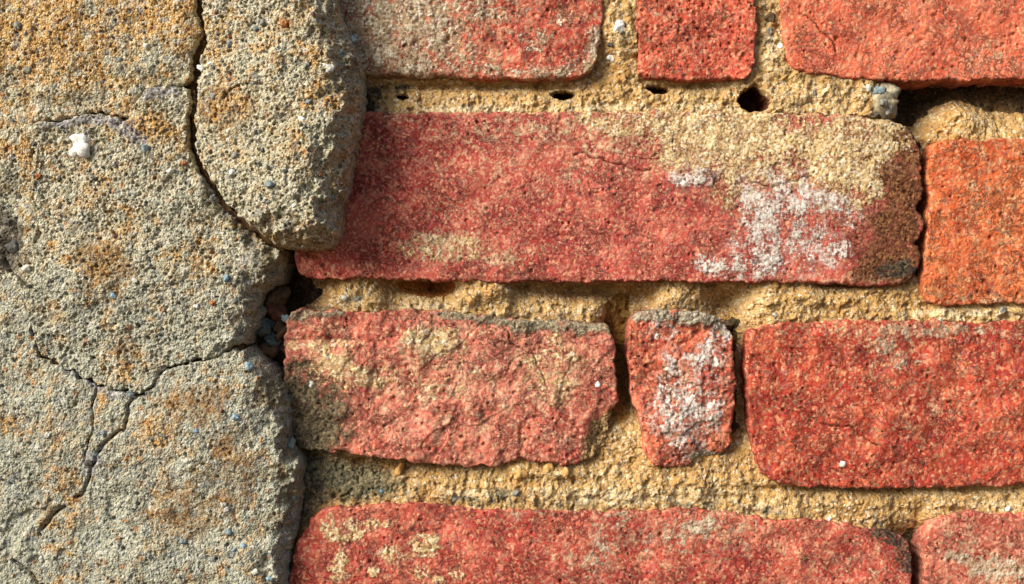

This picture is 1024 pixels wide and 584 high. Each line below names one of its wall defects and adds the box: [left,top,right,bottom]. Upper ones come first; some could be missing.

crack [54,113,129,123]
crack [181,0,283,251]
damp [398,233,484,262]
damp [564,109,924,287]
crack [40,352,145,527]
crack [161,358,206,374]
damp [629,308,732,460]